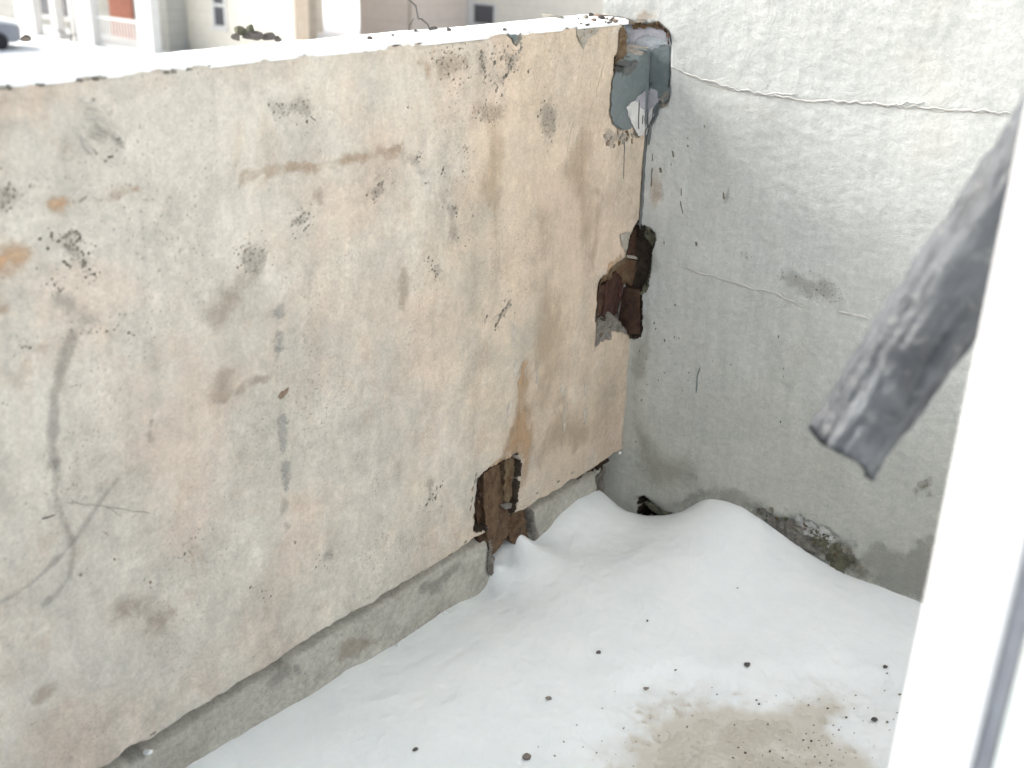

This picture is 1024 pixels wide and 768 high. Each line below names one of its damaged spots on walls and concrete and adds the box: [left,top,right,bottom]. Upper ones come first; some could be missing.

spalling [603,15,670,72]
peeling [603,90,669,148]
crack [671,66,1012,117]
spalling [595,220,657,347]
spalling [464,453,539,576]
water stain [757,507,867,577]